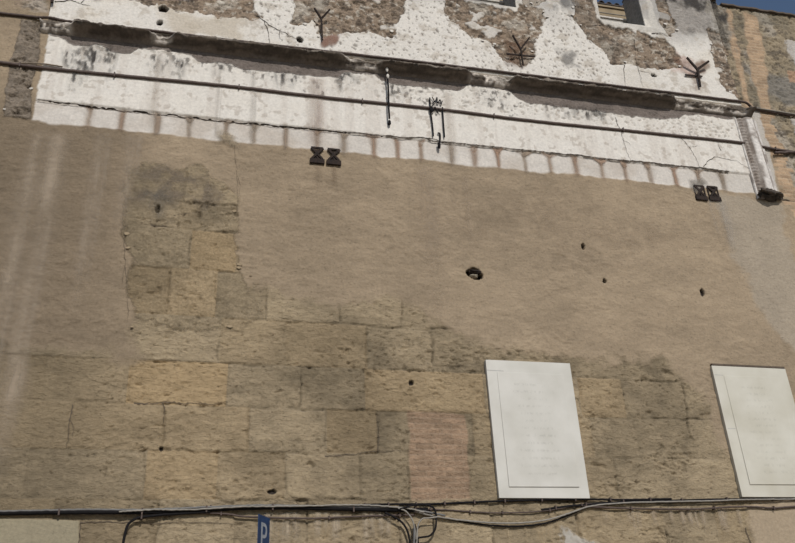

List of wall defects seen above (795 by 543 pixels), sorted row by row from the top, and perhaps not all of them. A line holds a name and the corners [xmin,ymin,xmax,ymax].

leakage [72,48,115,81]
spalling [136,0,263,21]
spalling [290,0,406,38]
spalling [444,0,549,67]
spalling [571,0,683,70]
spalling [706,28,739,100]
crack [37,99,748,173]
leakage [563,530,594,543]